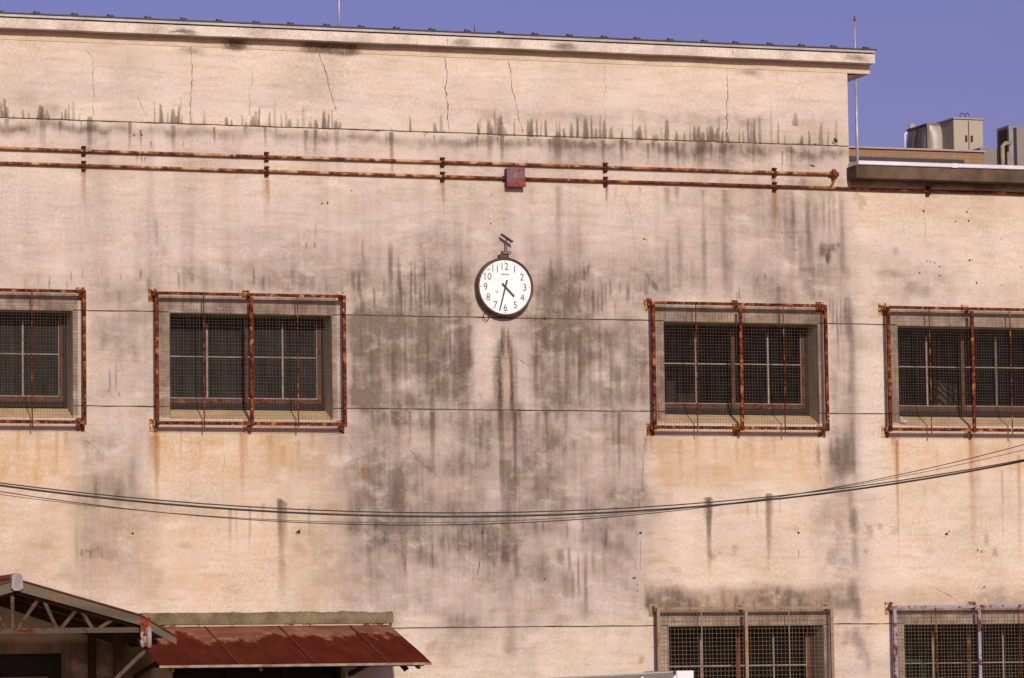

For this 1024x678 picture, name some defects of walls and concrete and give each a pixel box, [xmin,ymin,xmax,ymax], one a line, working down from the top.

water stain [528,121,606,139]
water stain [693,131,729,146]
water stain [498,334,513,425]